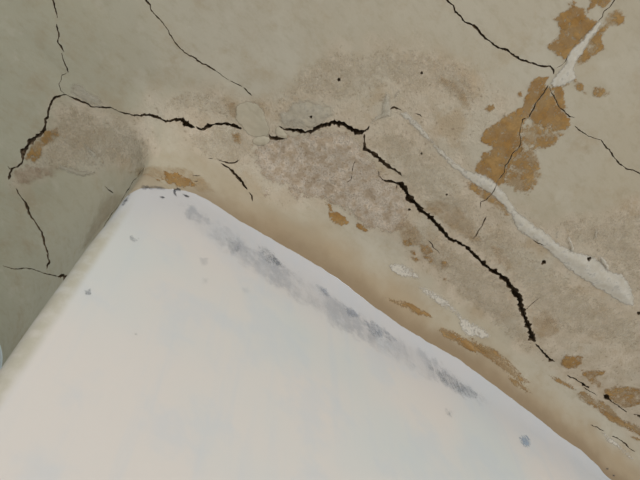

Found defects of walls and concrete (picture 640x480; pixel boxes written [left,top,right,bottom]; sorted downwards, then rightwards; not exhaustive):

peeling [548,0,625,63]
crack [4,0,253,281]
peeling [157,171,195,187]
flaking render [236,101,408,232]
crack [269,0,640,362]
peeling [475,77,570,192]
peeling [397,301,431,317]
peeling [439,330,526,390]
peeling [554,356,640,440]
crack [567,375,640,417]